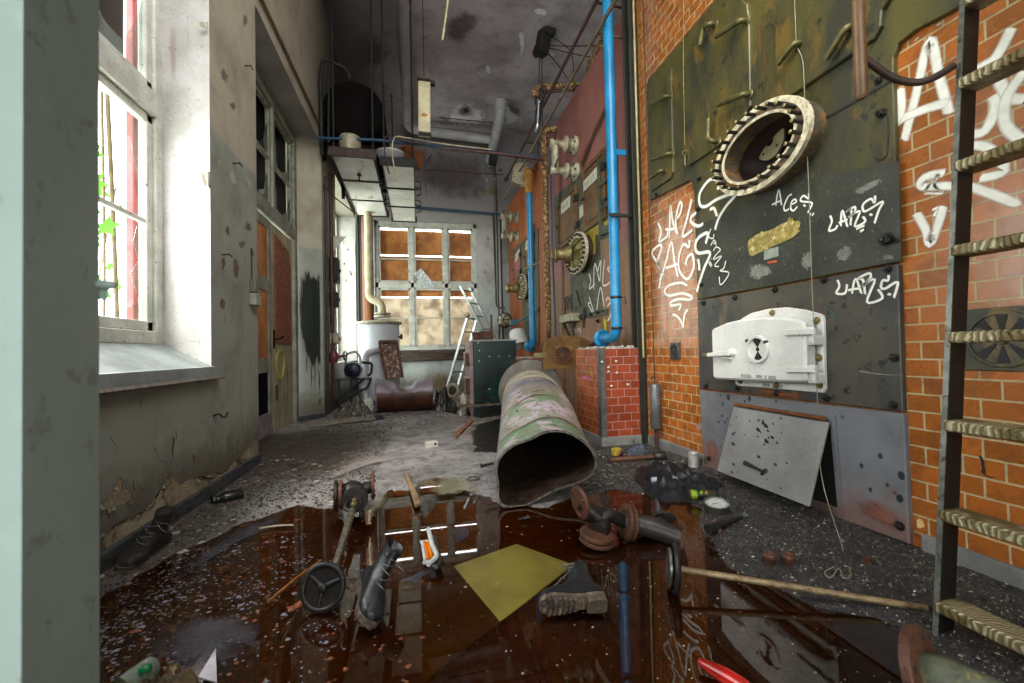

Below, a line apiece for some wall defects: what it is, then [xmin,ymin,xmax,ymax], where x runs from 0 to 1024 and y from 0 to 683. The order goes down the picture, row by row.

spalling [100,439,259,548]